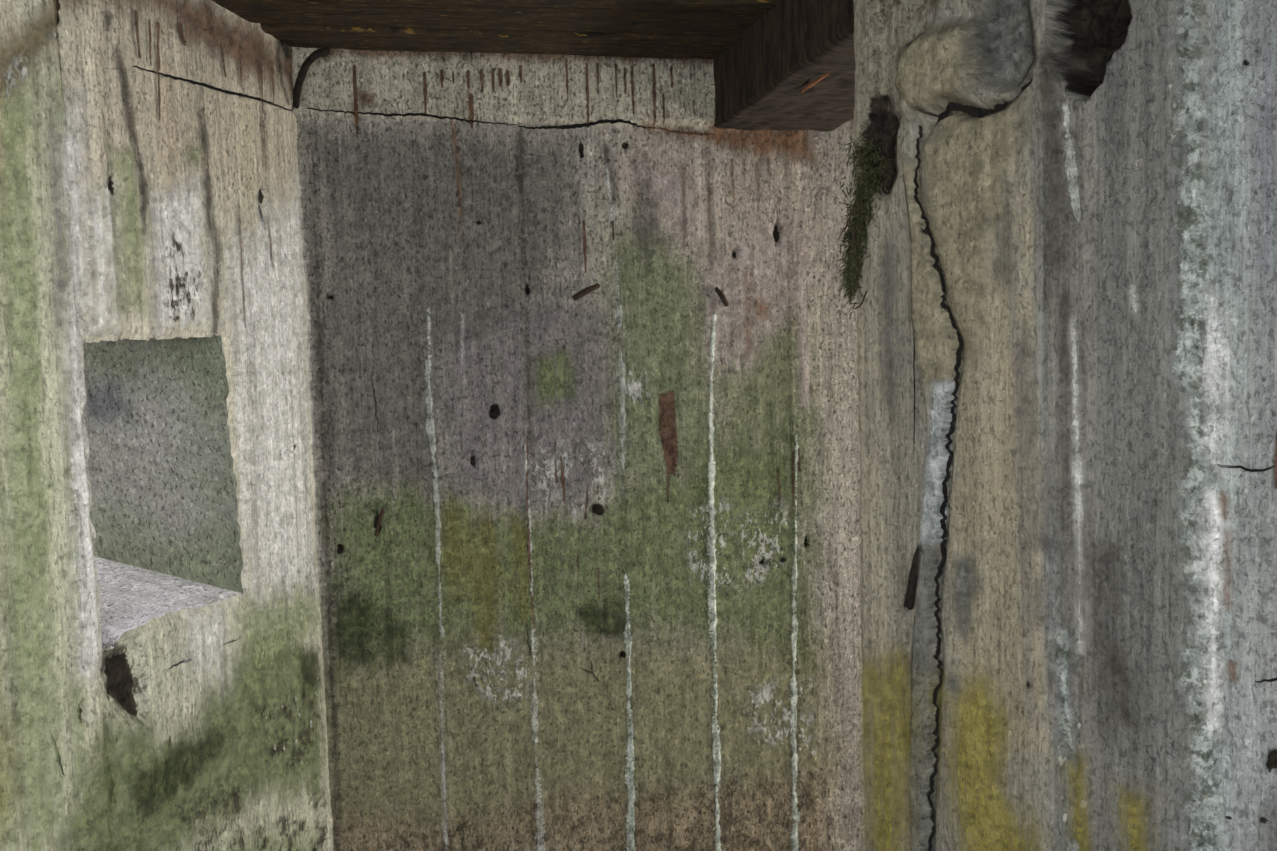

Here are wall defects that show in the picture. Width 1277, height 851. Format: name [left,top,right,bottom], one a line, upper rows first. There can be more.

crack [133,66,714,136]
leakage [1041,53,1088,276]
spalling [1056,0,1132,96]
leakage [424,307,445,638]
leakage [524,255,649,596]
corrosion [659,390,678,503]
leakage [688,217,810,851]
crack [903,81,1032,851]
leakage [1060,290,1076,402]
leakage [1062,422,1081,531]
leakage [530,614,546,851]
leakage [623,570,636,851]